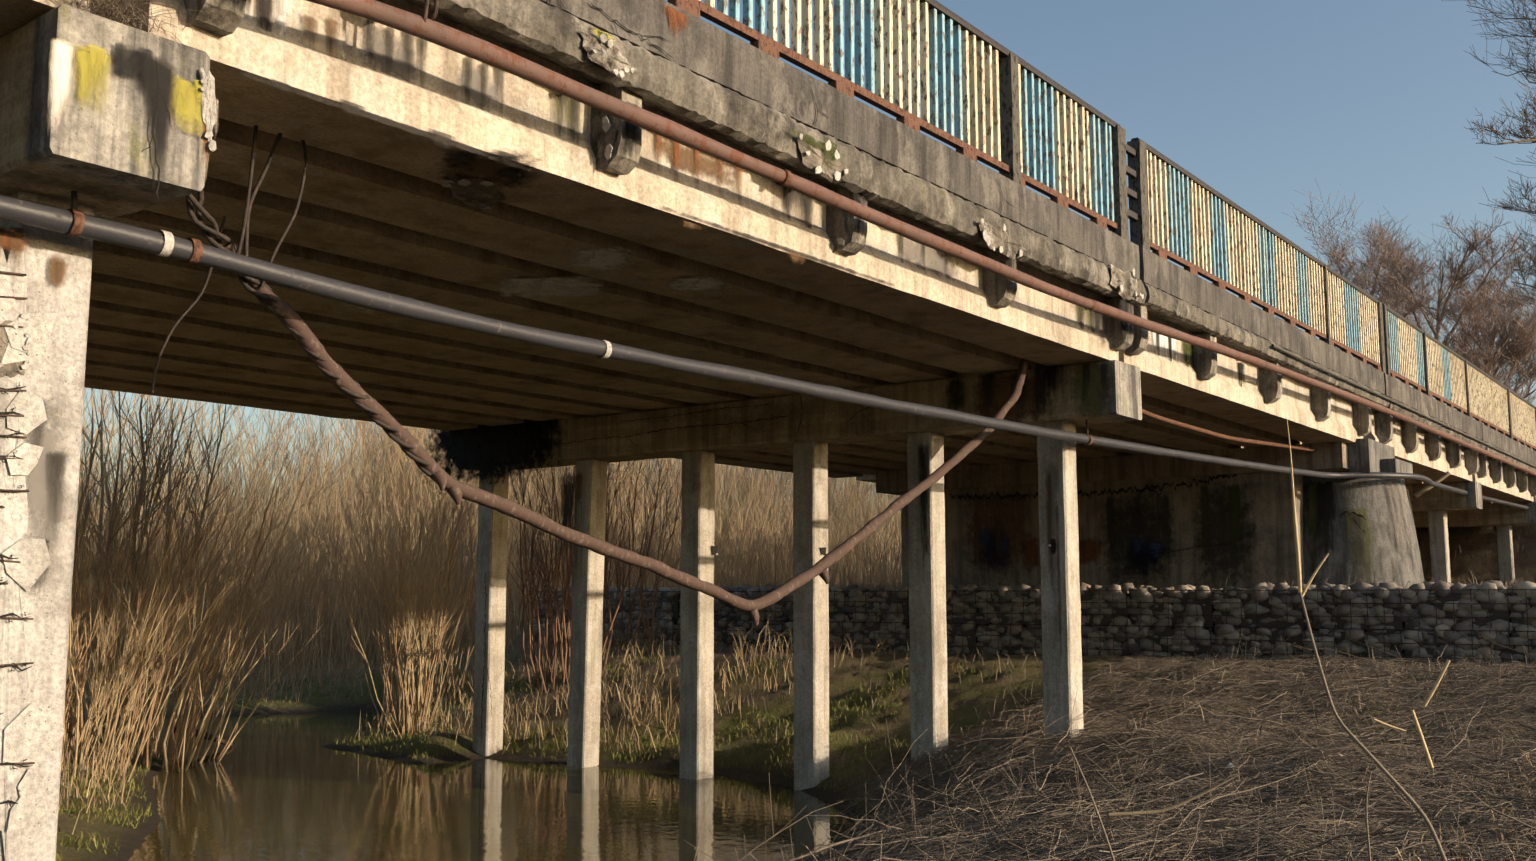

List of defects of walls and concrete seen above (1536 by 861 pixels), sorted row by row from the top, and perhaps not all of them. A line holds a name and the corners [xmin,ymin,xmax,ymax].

water stain [231,0,347,59]
water stain [366,19,427,82]
water stain [461,57,504,107]
water stain [555,92,580,132]
crack [0,382,28,507]
spalling [0,245,64,861]
water stain [1194,483,1255,585]
crack [0,555,31,622]
crack [0,662,32,672]
crack [0,759,33,807]